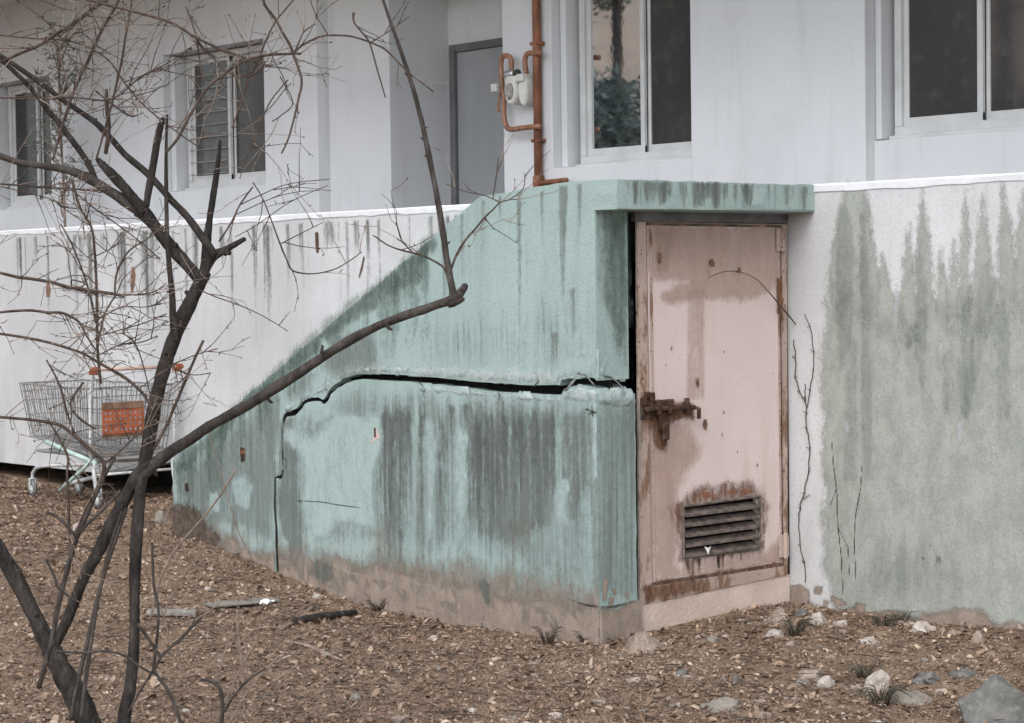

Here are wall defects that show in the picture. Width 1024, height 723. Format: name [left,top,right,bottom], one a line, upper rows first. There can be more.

damp [680,183,720,206]
damp [174,235,435,485]
damp [377,408,425,555]
crack [274,363,613,572]
damp [449,405,583,534]
corrosion [643,401,784,604]
damp [819,188,1024,626]